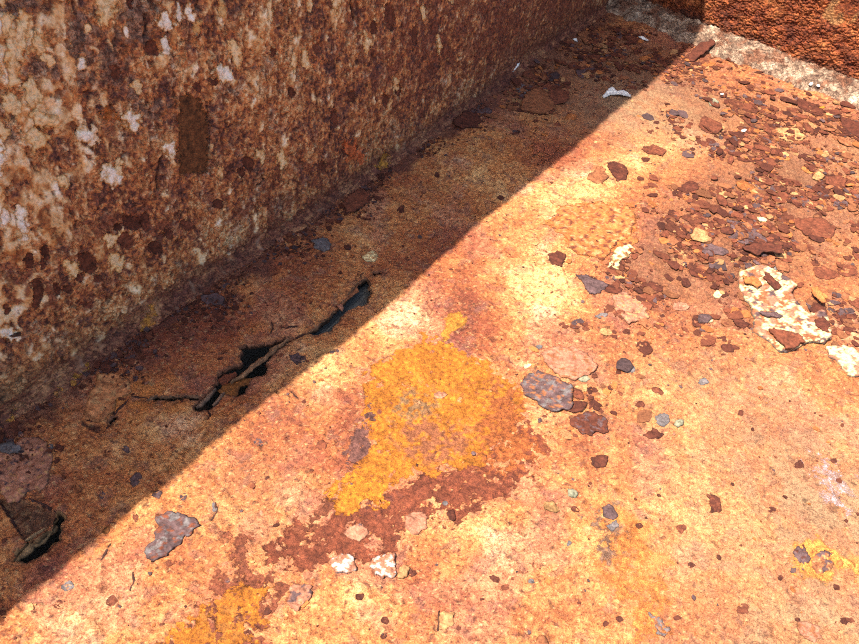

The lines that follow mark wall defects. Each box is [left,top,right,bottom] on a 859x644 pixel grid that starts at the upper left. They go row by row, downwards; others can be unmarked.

rust [641,144,666,162]
rust [699,97,762,164]
crack [106,271,383,429]
rust [537,250,566,267]
rust [575,274,664,295]
rust [732,307,806,349]
rust [810,262,859,332]
rust [563,373,613,436]
rust [156,312,553,644]
rust [144,511,201,567]
rust [571,500,674,644]
rust [778,534,859,590]